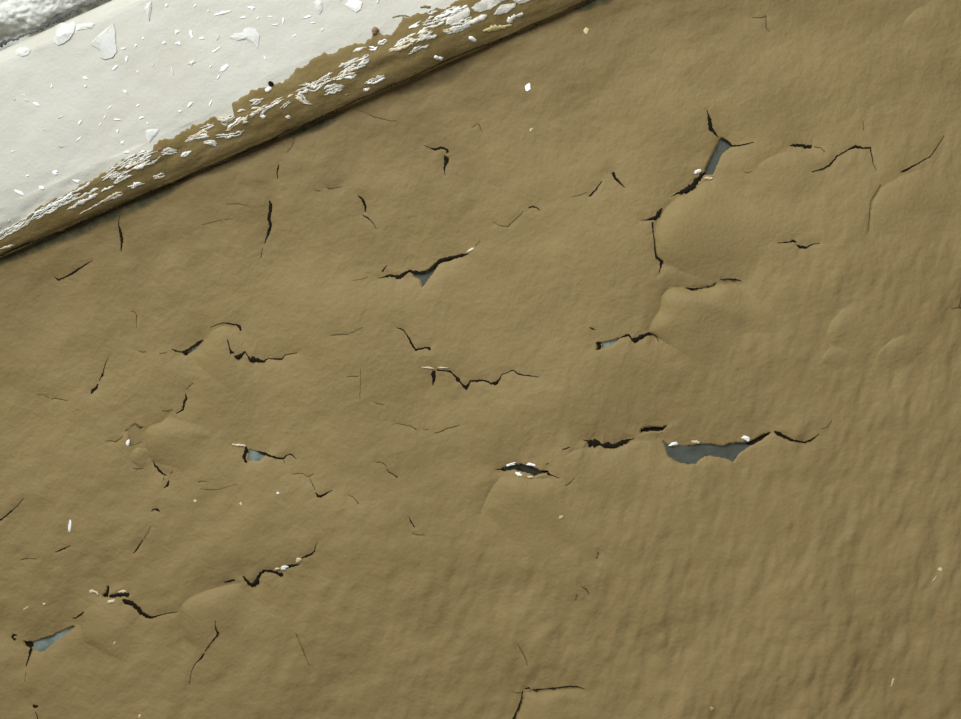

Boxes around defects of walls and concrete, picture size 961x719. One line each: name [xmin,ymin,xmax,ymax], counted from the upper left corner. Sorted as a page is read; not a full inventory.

peeling [0,0,530,249]
spalling [671,111,753,197]
crack [790,125,880,225]
spalling [380,241,480,287]
crack [212,322,293,363]
crack [398,328,538,390]
spalling [232,444,296,463]
spalling [497,462,571,486]
crack [562,438,634,450]
spalling [641,426,769,464]
crack [224,545,316,587]
crack [122,599,178,618]